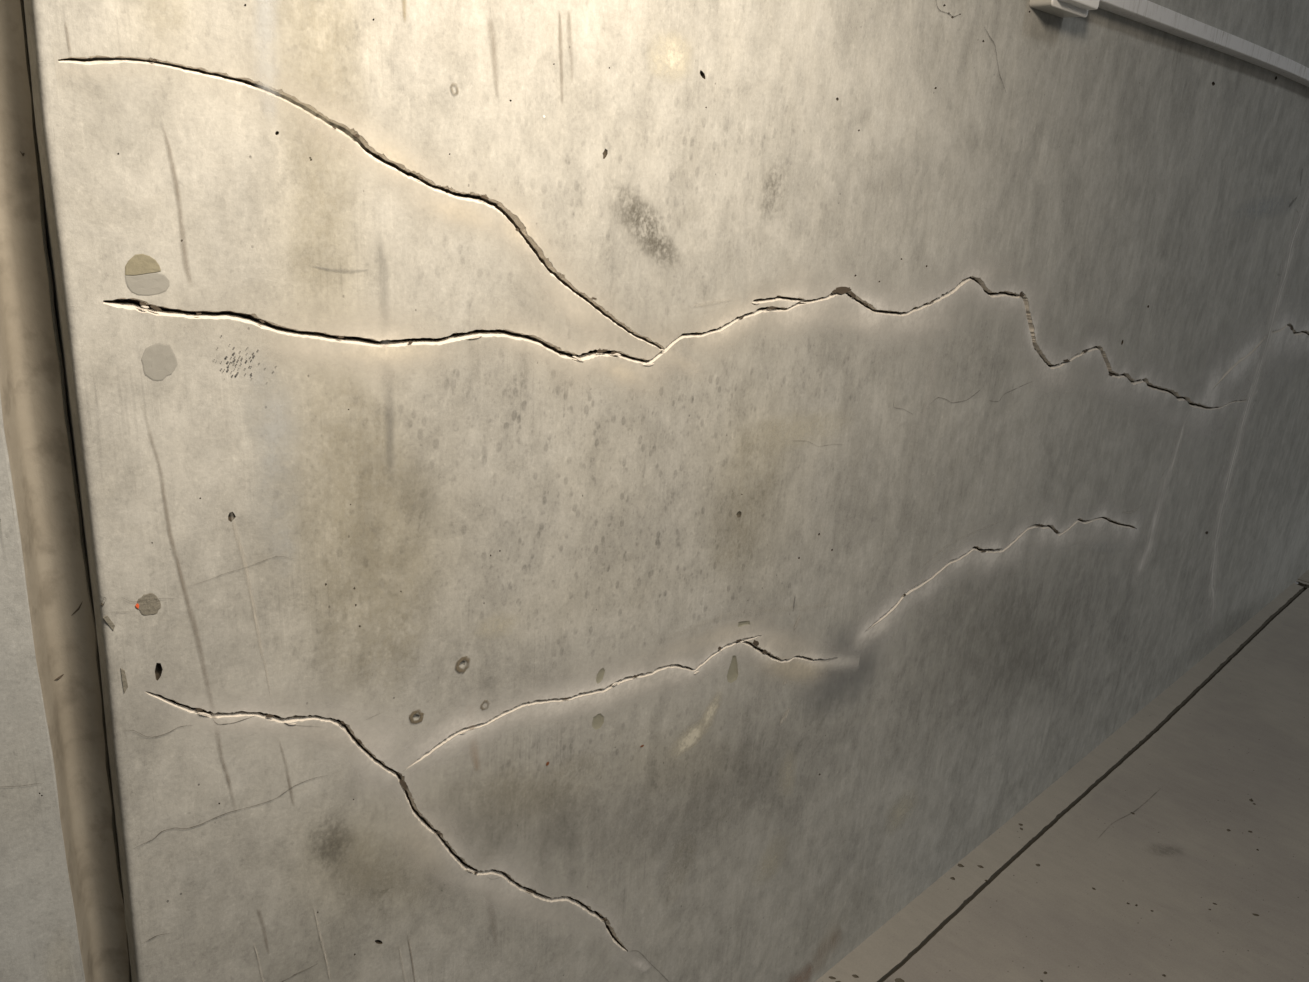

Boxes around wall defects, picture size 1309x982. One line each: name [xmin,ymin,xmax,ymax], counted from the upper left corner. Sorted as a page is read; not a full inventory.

crack [40,55,1309,436]
crack [123,504,1142,981]